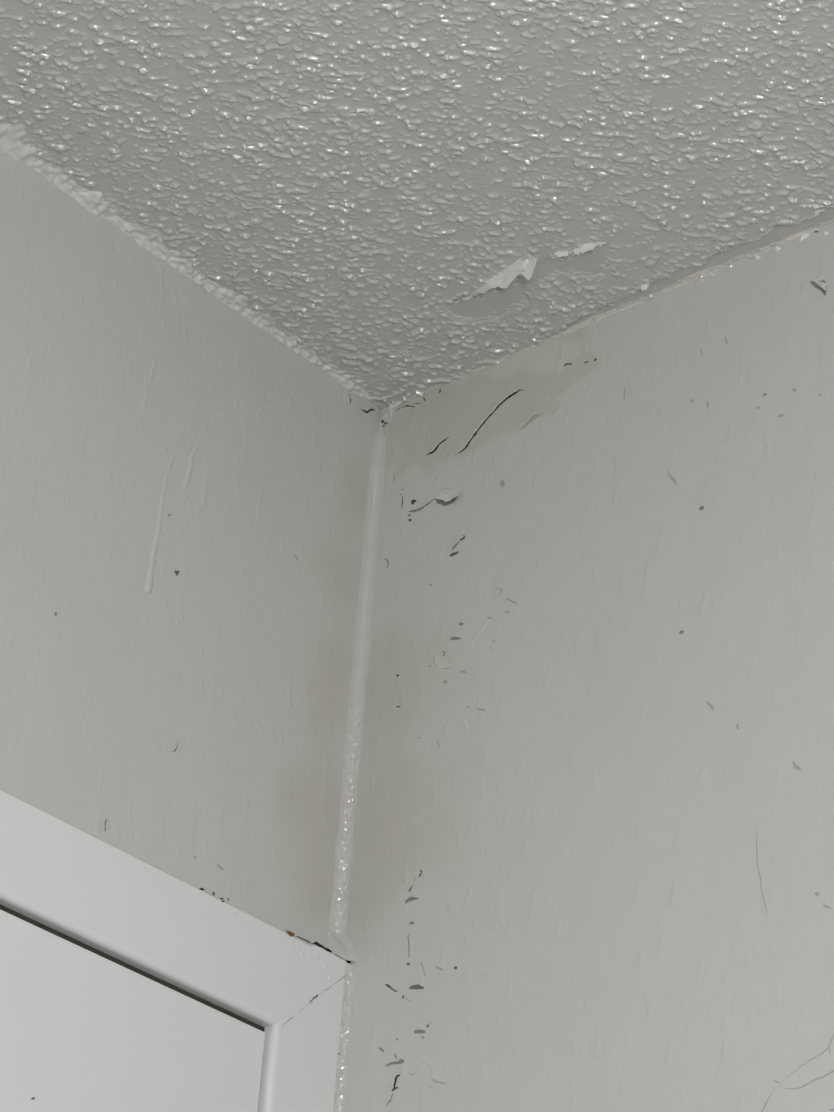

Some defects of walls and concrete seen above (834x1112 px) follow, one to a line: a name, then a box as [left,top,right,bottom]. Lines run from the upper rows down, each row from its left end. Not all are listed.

peeling [553,242,605,257]
peeling [453,253,538,303]
crack [426,386,521,458]
peeling [406,487,459,524]